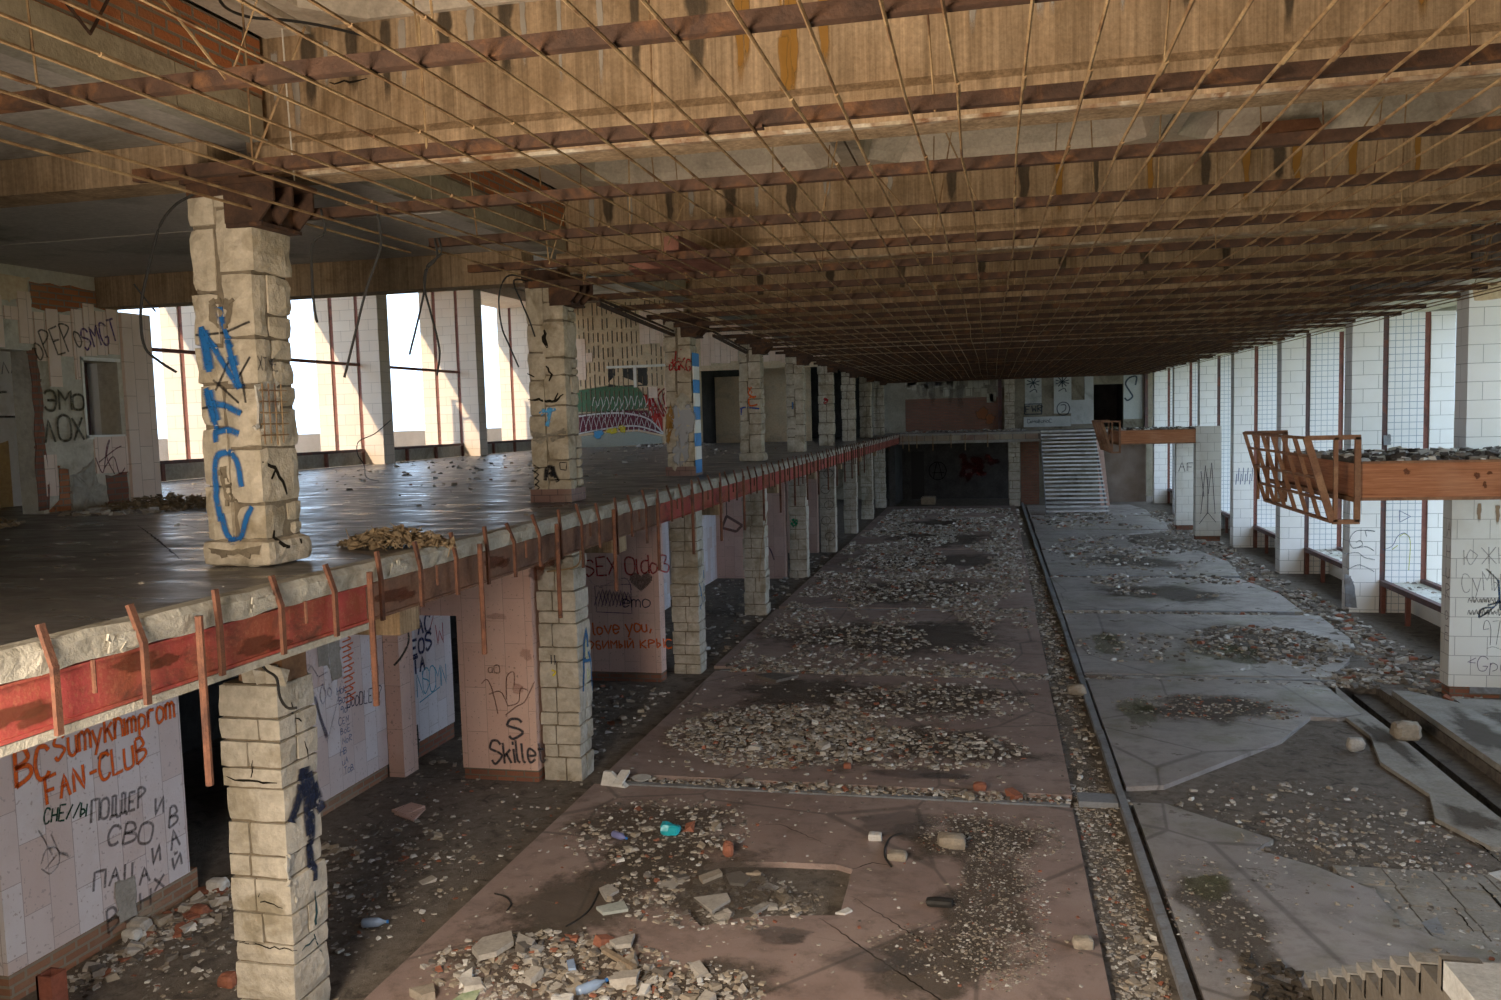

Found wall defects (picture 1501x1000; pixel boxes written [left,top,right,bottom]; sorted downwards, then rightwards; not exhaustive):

flaking render [29,281,106,313]
crack [262,461,288,495]
crack [272,530,302,549]
corrosion [529,560,555,580]
corrosion [239,635,293,656]
corrosion [113,651,179,672]
crack [226,760,274,784]
crack [239,891,322,952]